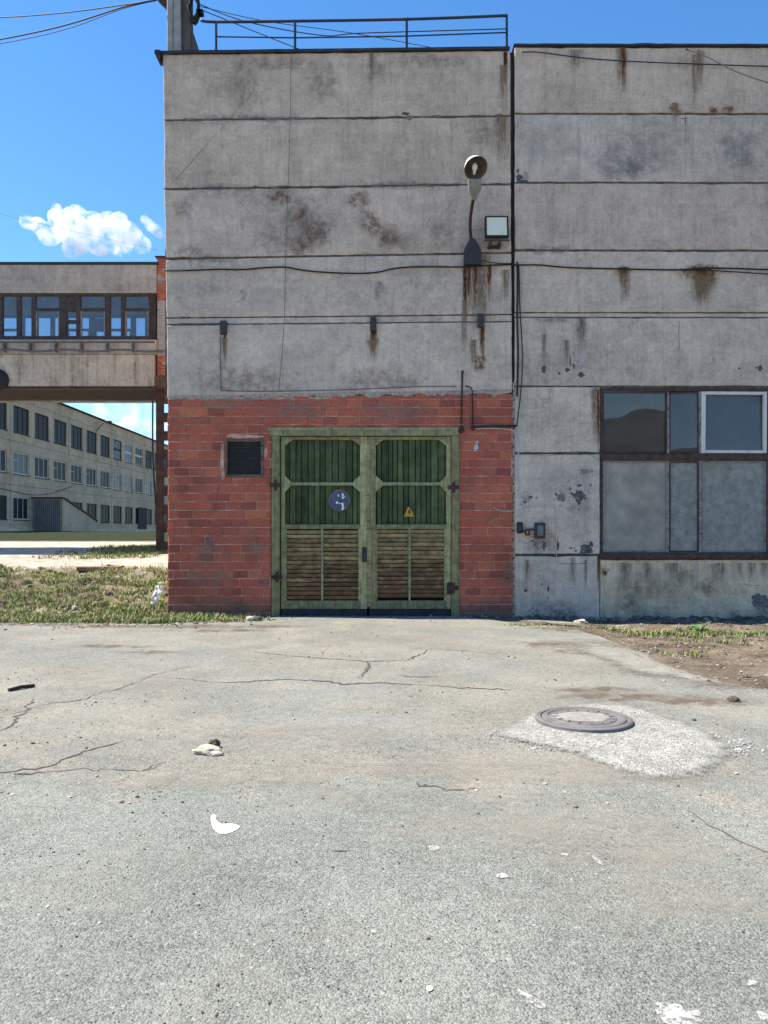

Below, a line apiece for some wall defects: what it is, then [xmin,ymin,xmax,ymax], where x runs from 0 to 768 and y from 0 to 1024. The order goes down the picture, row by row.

corrosion [617,48,627,83]
leakage [349,192,397,243]
corrosion [619,267,628,292]
corrosion [683,265,716,298]
corrosion [462,254,491,369]
spalling [555,466,593,506]
spalling [531,539,593,556]
spalling [751,593,768,611]